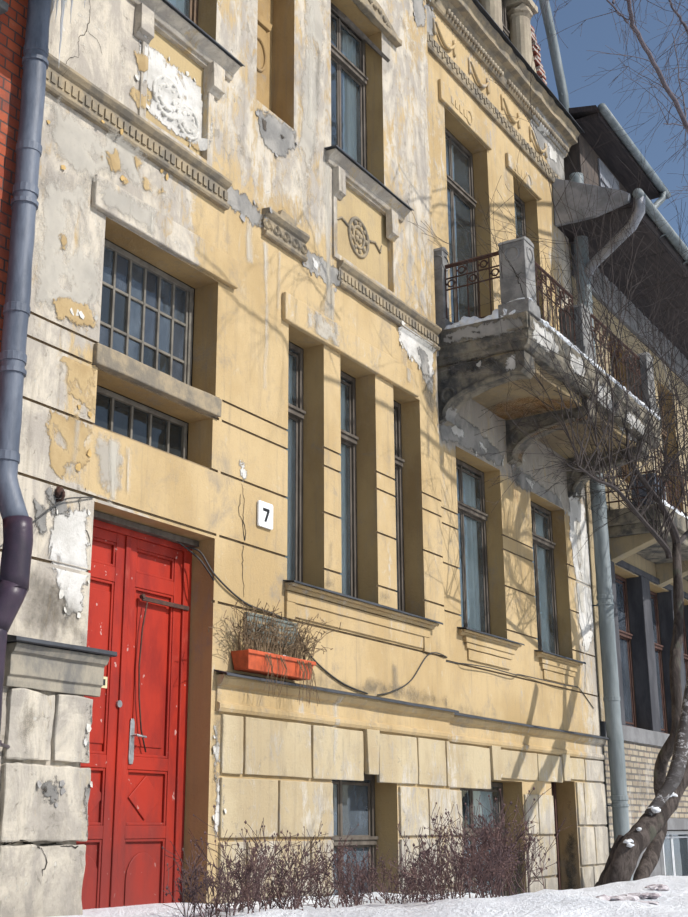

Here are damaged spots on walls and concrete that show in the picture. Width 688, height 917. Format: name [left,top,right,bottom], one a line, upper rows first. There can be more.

flaking render [412,0,436,36]
peeling [130,35,213,151]
flaking render [255,110,298,158]
peeling [36,99,169,331]
flaking render [227,186,273,260]
peeling [45,356,96,479]
peeling [398,316,559,393]
peeling [570,353,645,443]
peeling [33,487,91,620]
crack [238,486,246,592]
peeling [440,406,594,654]
peeling [212,725,227,837]